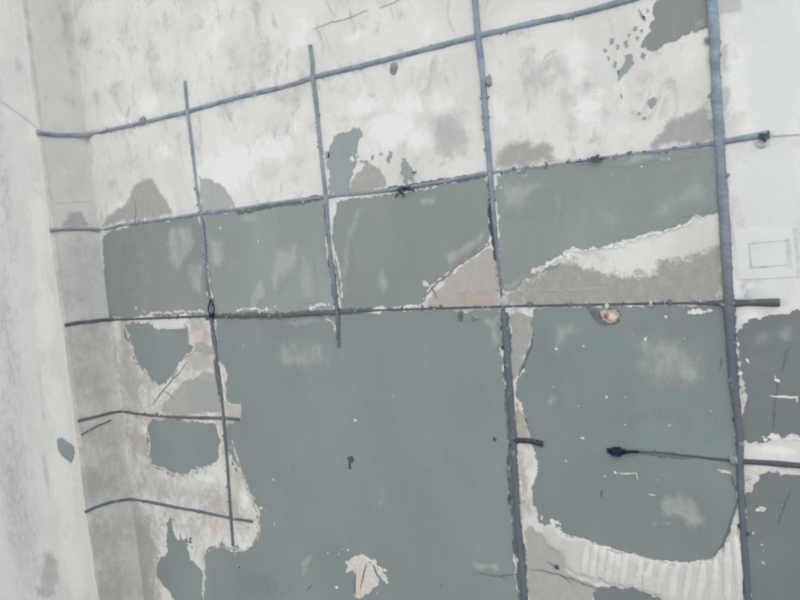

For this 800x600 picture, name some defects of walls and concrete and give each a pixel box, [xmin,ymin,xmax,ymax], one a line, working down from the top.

peeling [604,0,708,80]
peeling [102,127,718,600]
peeling [516,305,800,600]